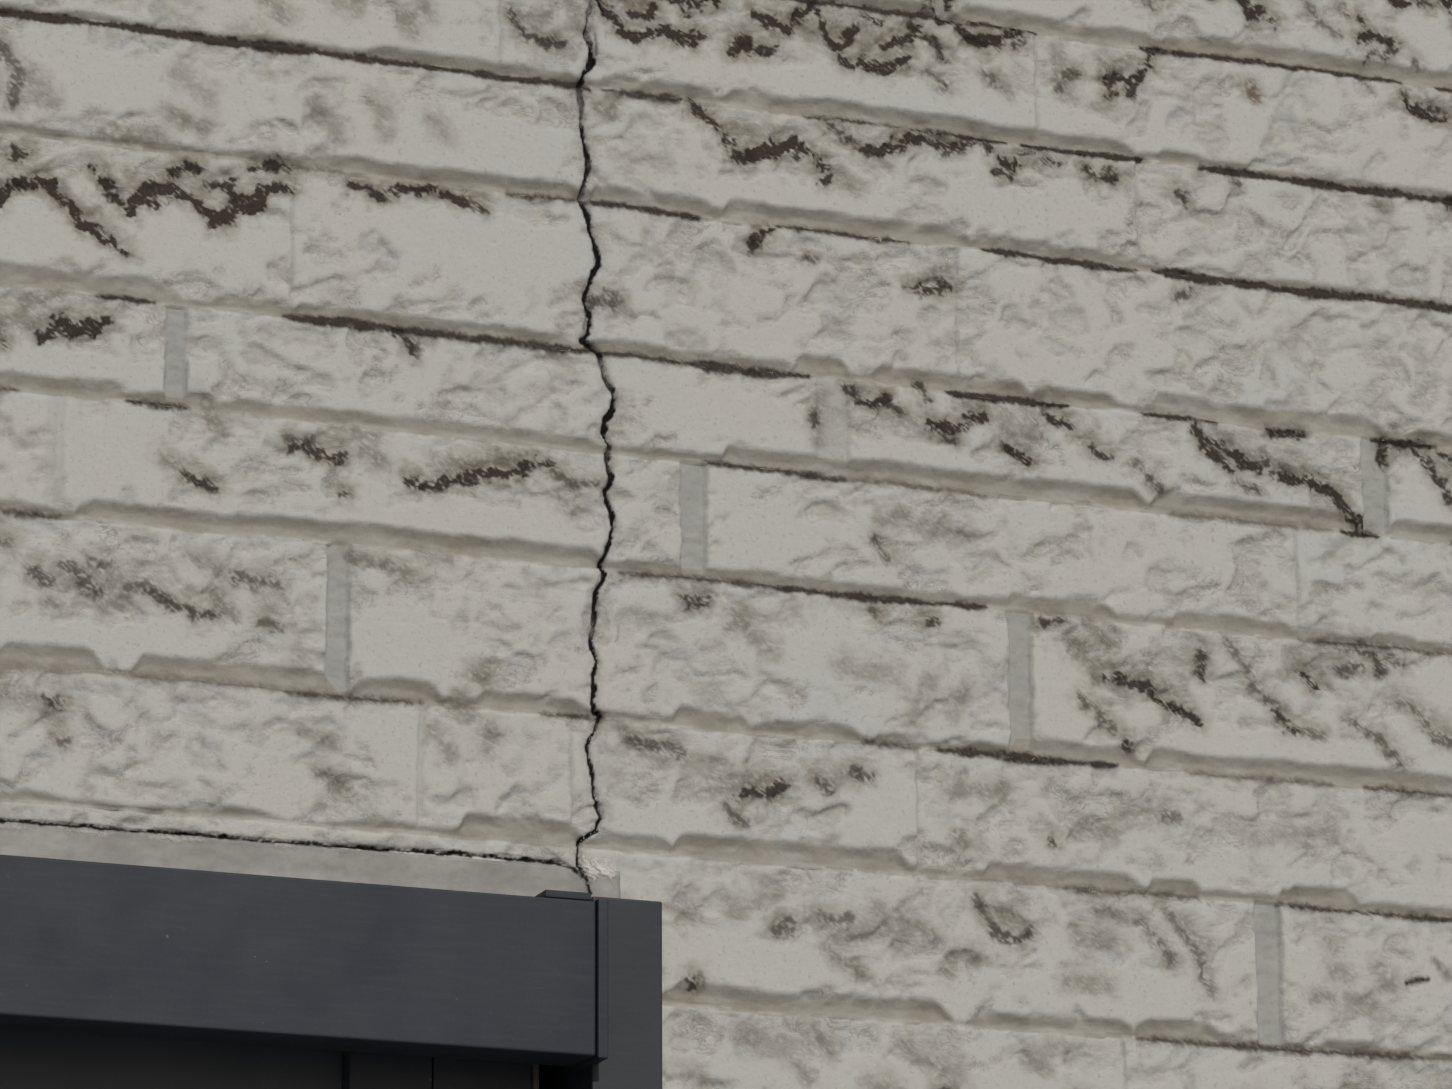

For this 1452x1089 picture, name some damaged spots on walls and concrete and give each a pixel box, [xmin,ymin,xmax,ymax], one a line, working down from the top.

water stain [727,0,947,76]
water stain [1237,0,1276,30]
water stain [1356,14,1399,64]
water stain [807,116,1143,181]
water stain [87,155,295,229]
water stain [508,193,700,221]
water stain [34,294,155,345]
water stain [841,384,904,417]
water stain [912,382,1073,445]
crack [0,0,616,894]
water stain [1001,441,1032,466]
water stain [1141,412,1331,494]